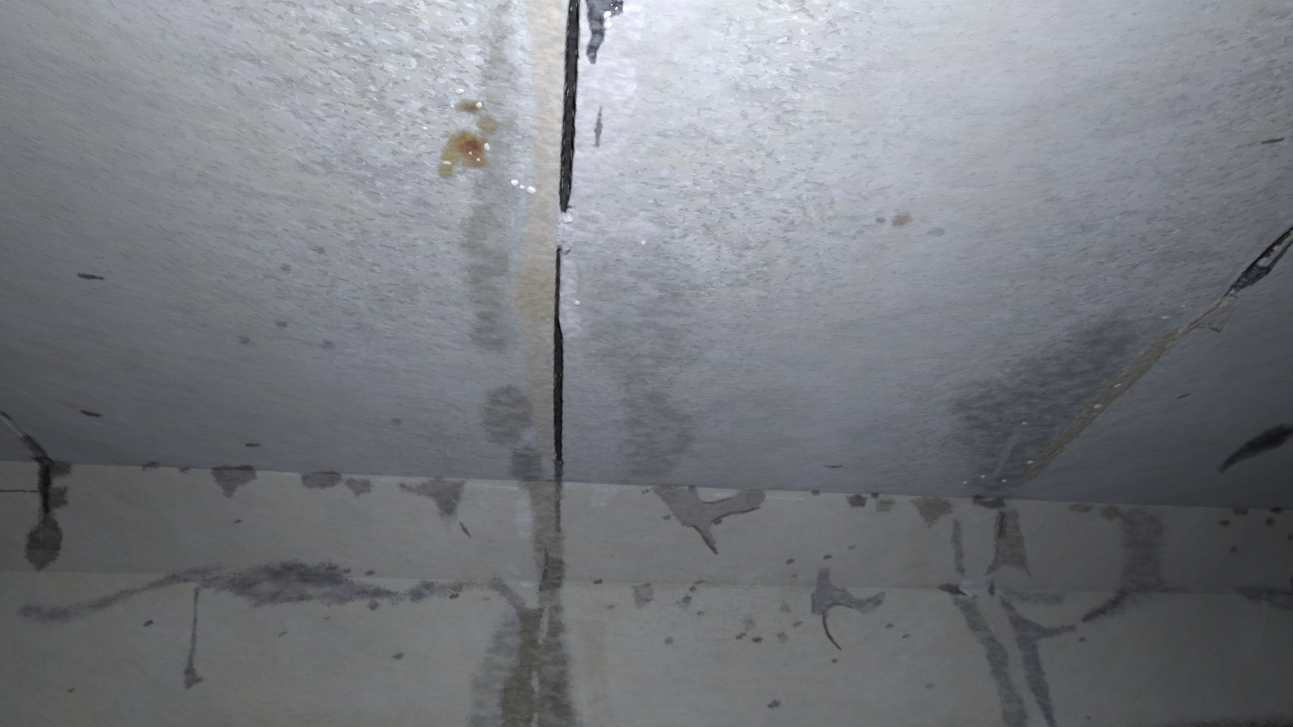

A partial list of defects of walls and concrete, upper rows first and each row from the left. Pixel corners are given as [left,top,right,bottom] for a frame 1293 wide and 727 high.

spalling [582,0,623,64]
rust [440,122,489,176]
crack [559,0,579,213]
crack [1188,227,1293,327]
crack [24,437,45,463]
crack [539,248,564,591]
leakage [3,457,72,566]
peeling [656,486,765,554]
peeling [814,570,880,648]
leakage [941,496,1120,727]